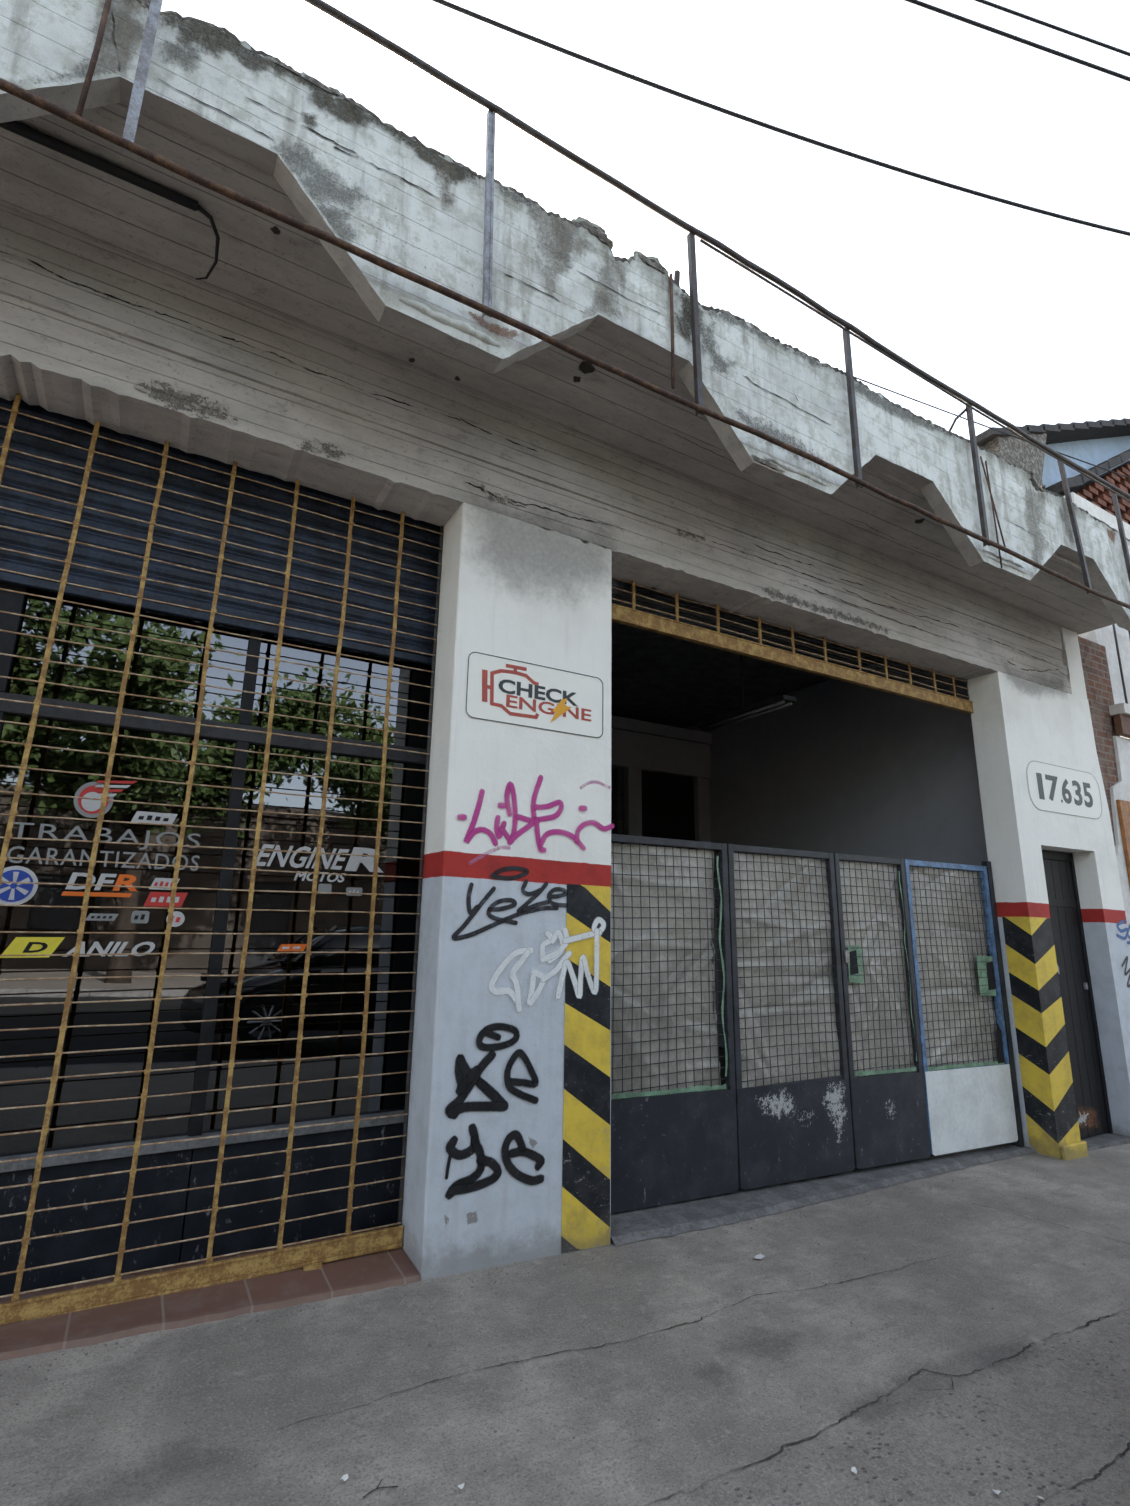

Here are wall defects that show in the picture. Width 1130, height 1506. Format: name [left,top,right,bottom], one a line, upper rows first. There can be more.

spalling [266,56,372,113]
water stain [499,184,582,289]
spalling [569,216,613,249]
crack [388,1258,936,1395]
crack [1071,1315,1111,1332]
crack [743,1344,1031,1468]
crack [1072,1442,1130,1488]